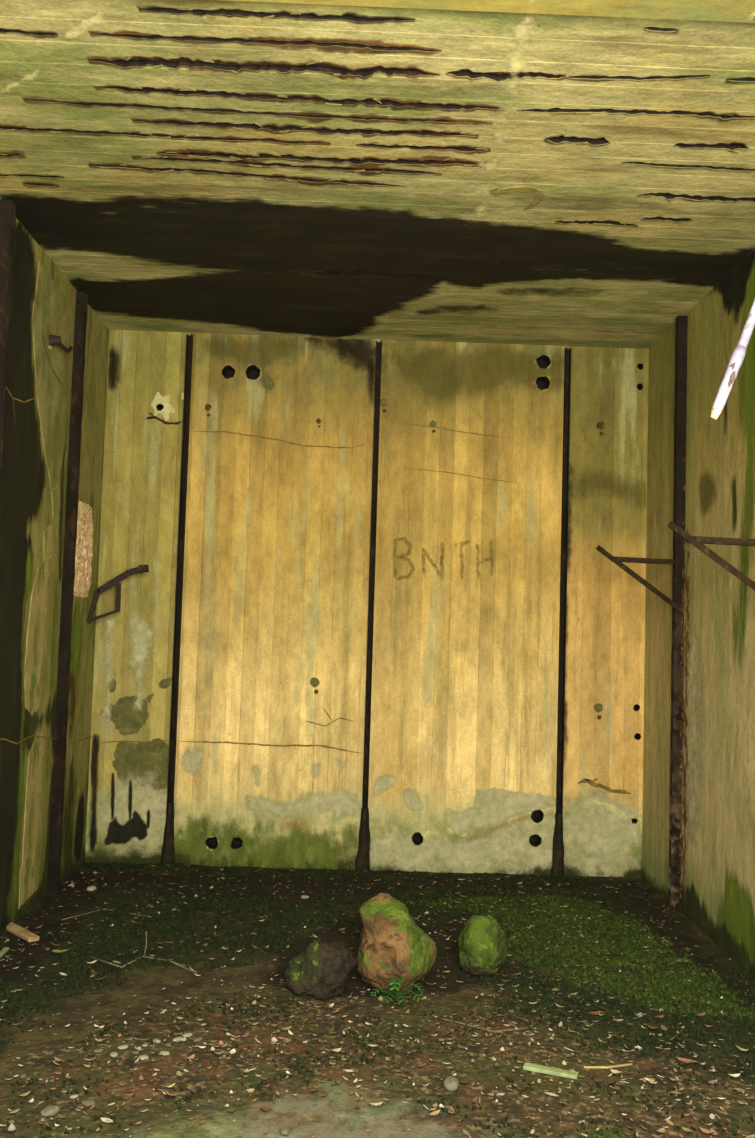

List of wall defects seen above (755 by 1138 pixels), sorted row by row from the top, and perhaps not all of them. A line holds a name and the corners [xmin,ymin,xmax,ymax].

damp [65,4,107,38]
damp [495,17,537,145]
spalling [74,501,94,598]
damp [0,158,755,931]